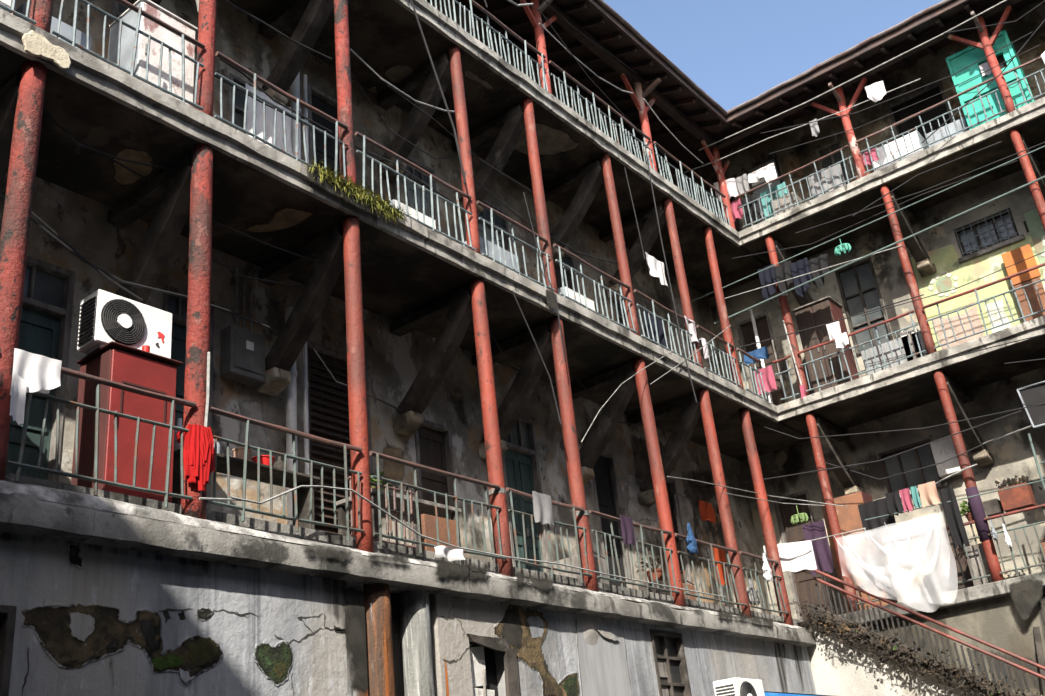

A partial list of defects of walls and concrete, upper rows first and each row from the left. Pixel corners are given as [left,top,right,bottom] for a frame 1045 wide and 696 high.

leakage [304,545,351,561]
flaking render [20,602,224,684]
crack [158,608,346,644]
flaking render [493,604,581,696]